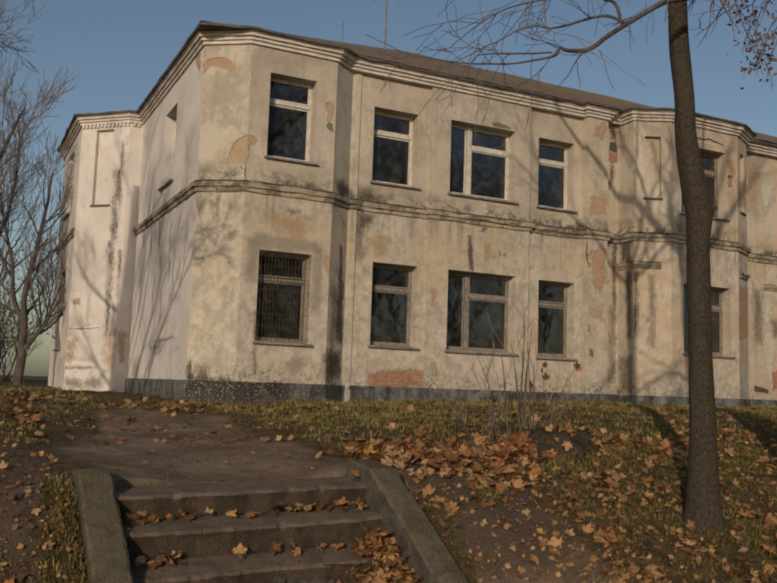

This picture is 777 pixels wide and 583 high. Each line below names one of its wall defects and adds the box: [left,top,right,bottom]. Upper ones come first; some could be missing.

flaking render [196,50,236,74]
flaking render [220,134,258,163]
damp [332,246,345,342]
damp [611,242,639,343]
peeling [739,287,748,339]
damp [323,350,340,382]
flaking render [356,363,438,387]
flaking render [754,370,777,394]